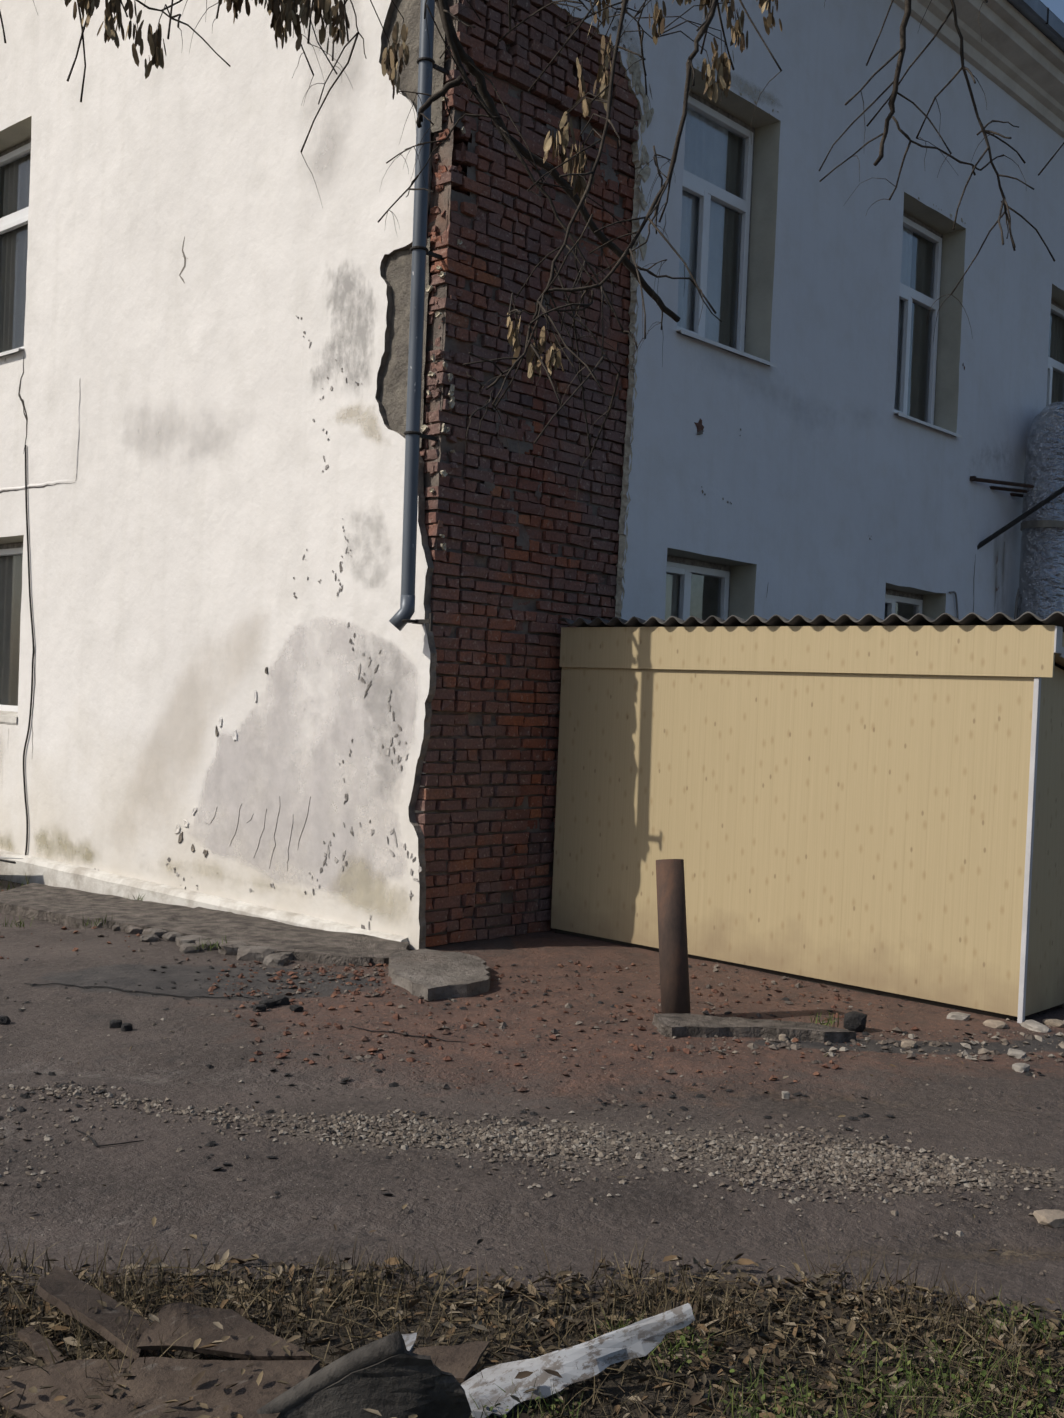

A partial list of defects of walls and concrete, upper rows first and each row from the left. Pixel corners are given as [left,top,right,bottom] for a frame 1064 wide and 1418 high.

crack [18,357,28,454]
spalling [304,0,654,947]